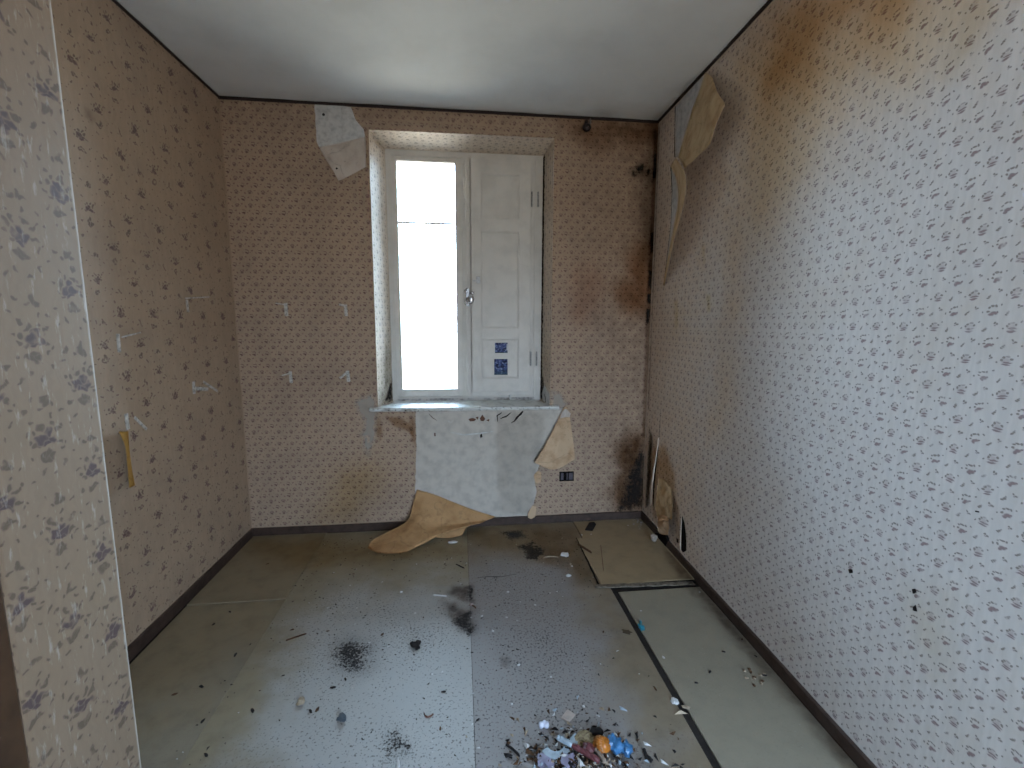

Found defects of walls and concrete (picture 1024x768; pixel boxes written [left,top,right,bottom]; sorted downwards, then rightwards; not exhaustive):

flaking render [314,105,365,147]
peeling [663,73,708,286]
flaking render [415,386,571,517]
water stain [618,434,652,512]